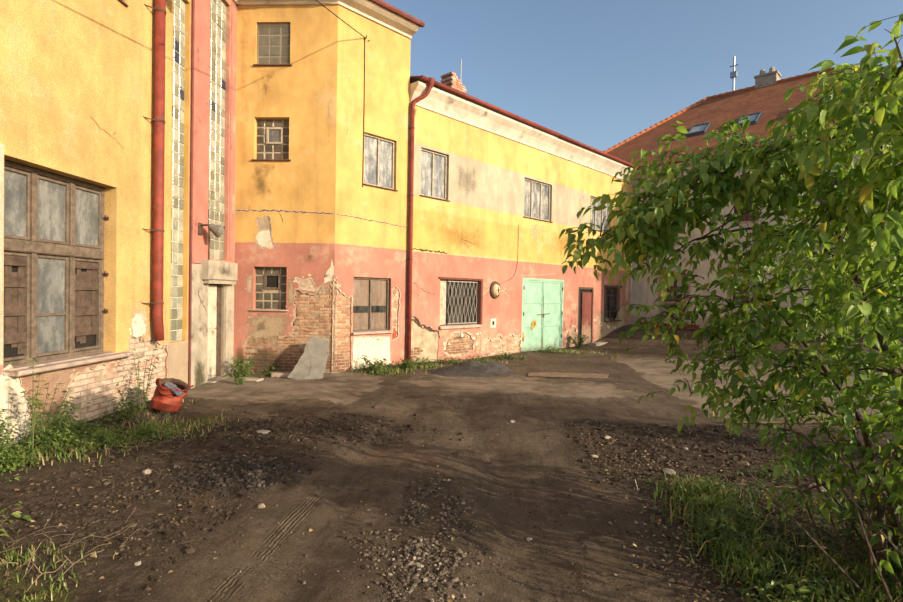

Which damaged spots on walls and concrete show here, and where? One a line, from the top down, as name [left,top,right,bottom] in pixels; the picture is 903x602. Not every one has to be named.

flaking render [254,215,277,249]
crack [236,204,557,298]
spalling [238,260,522,373]
flaking render [0,364,39,445]
spalling [59,311,169,425]